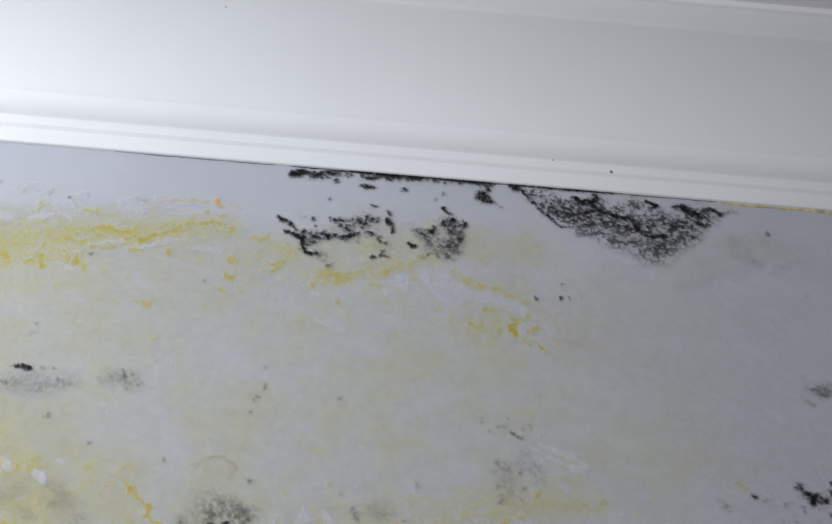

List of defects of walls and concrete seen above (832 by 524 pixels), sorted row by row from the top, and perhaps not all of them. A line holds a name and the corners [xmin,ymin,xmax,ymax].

damp [288,169,493,204]
damp [0,184,786,524]
damp [794,481,832,506]